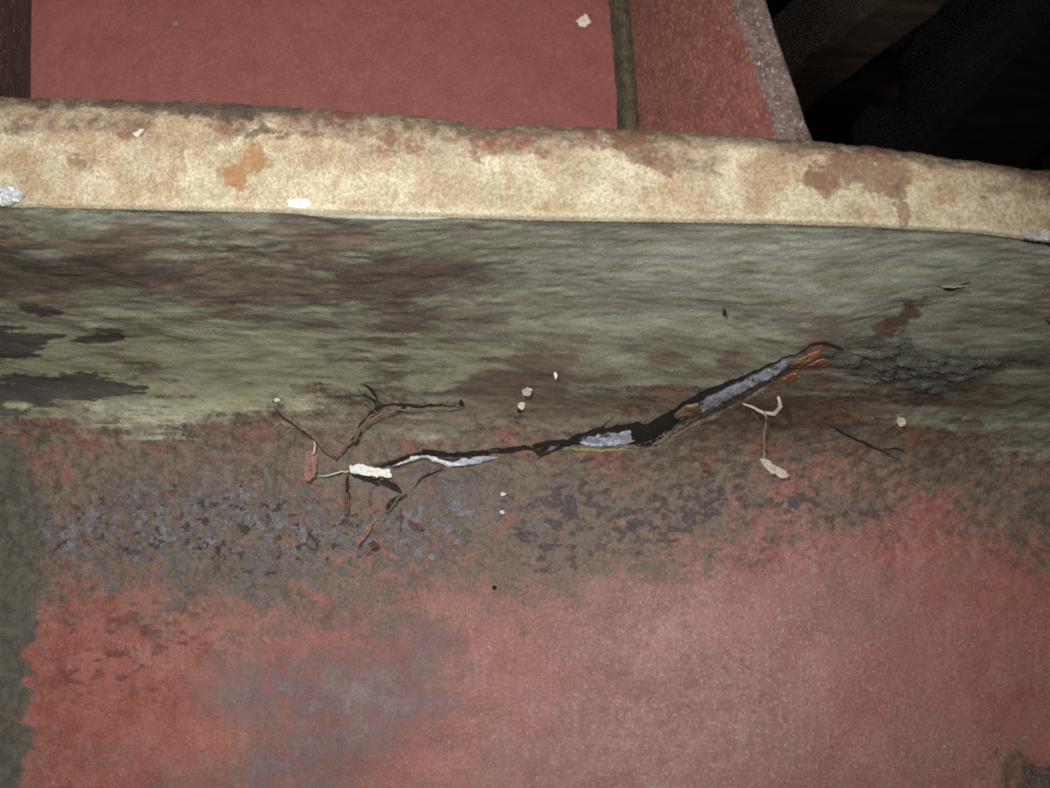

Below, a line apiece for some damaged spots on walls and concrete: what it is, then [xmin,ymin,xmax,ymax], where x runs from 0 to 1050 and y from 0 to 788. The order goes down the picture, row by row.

leakage [0,250,189,293]
leakage [307,252,486,298]
leakage [18,303,64,316]
rust [871,296,927,338]
leakage [0,325,126,359]
leakage [0,371,149,417]
crack [316,342,843,514]